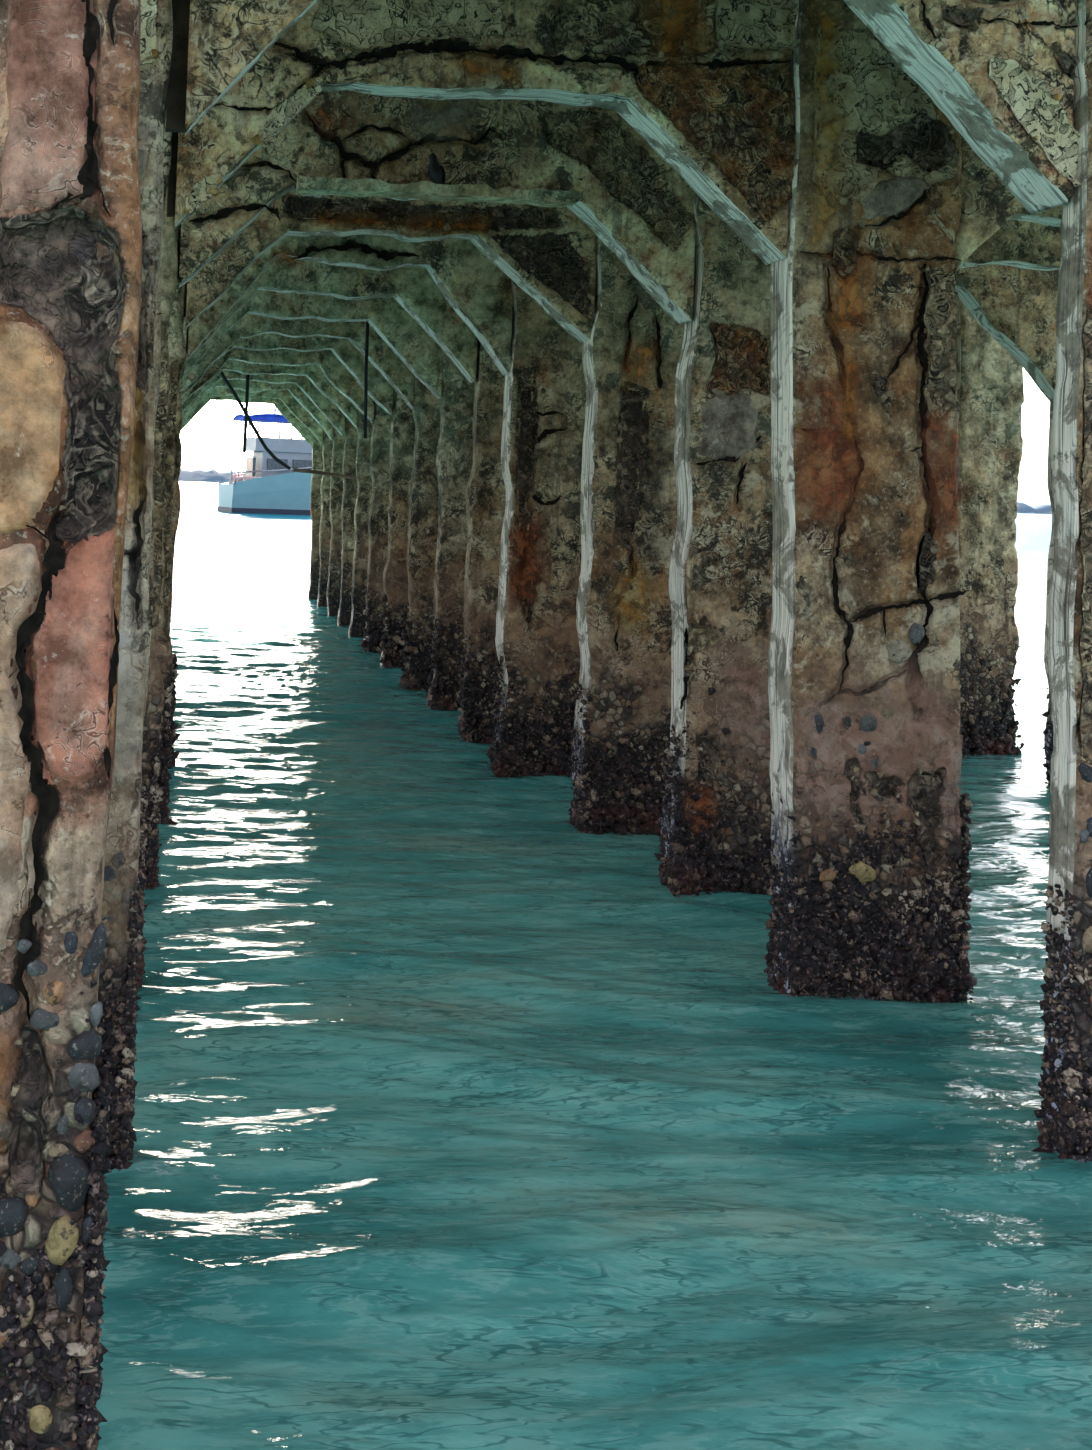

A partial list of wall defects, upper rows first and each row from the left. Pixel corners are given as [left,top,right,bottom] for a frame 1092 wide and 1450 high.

crack [214,39,792,179]
rust [832,257,869,438]
crack [800,190,969,720]
rust [509,519,546,611]